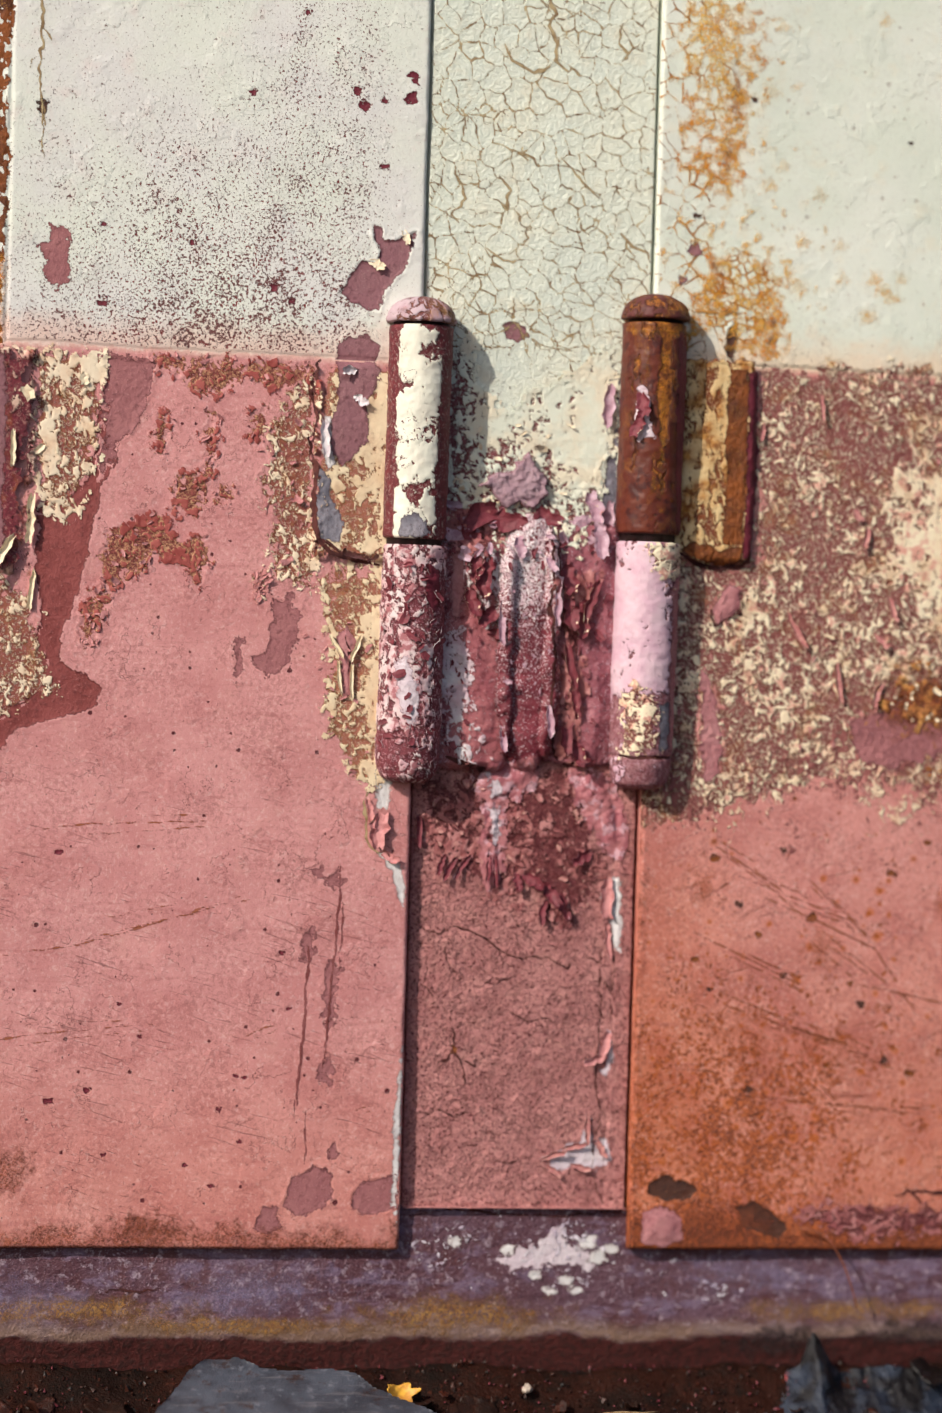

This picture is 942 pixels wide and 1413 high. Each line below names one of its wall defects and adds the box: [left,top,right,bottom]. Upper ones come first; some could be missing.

rust [668,0,784,196]
rust [0,0,16,343]
crack [427,0,775,380]
peeling [36,222,73,292]
peeling [341,225,417,311]
peeling [502,321,529,343]
peeling [0,330,942,960]
rust [864,658,942,778]
peeling [540,1115,612,1179]
rust [669,1199,942,1250]
peeling [736,1197,942,1247]
crack [894,1189,942,1206]